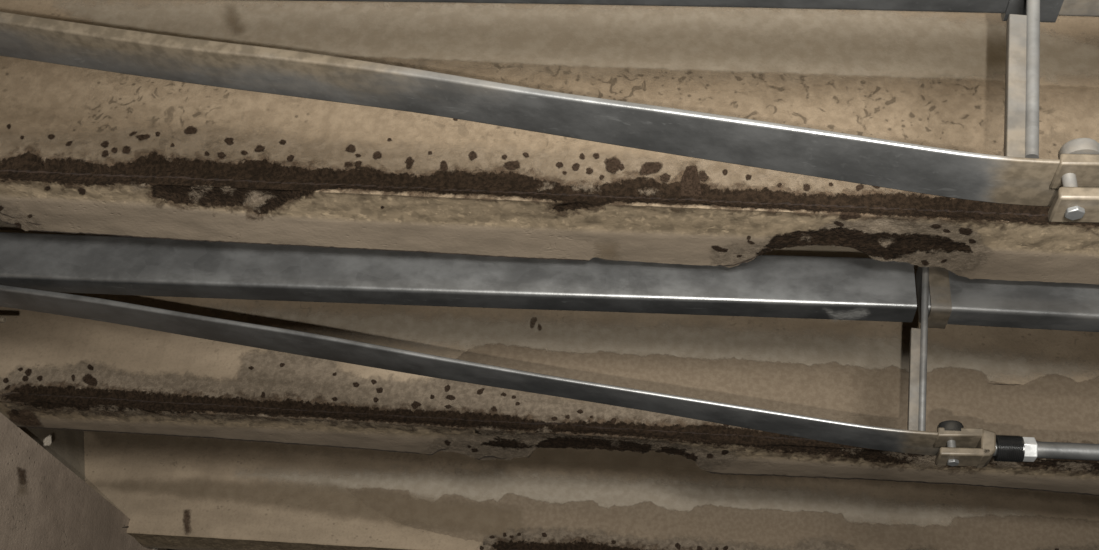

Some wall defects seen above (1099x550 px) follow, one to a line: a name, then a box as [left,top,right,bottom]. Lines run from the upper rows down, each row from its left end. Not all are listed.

spalling [0,124,1099,274]
corrosion [681,166,702,197]
spalling [0,351,1099,474]
damp [221,309,910,430]
damp [926,345,1099,444]